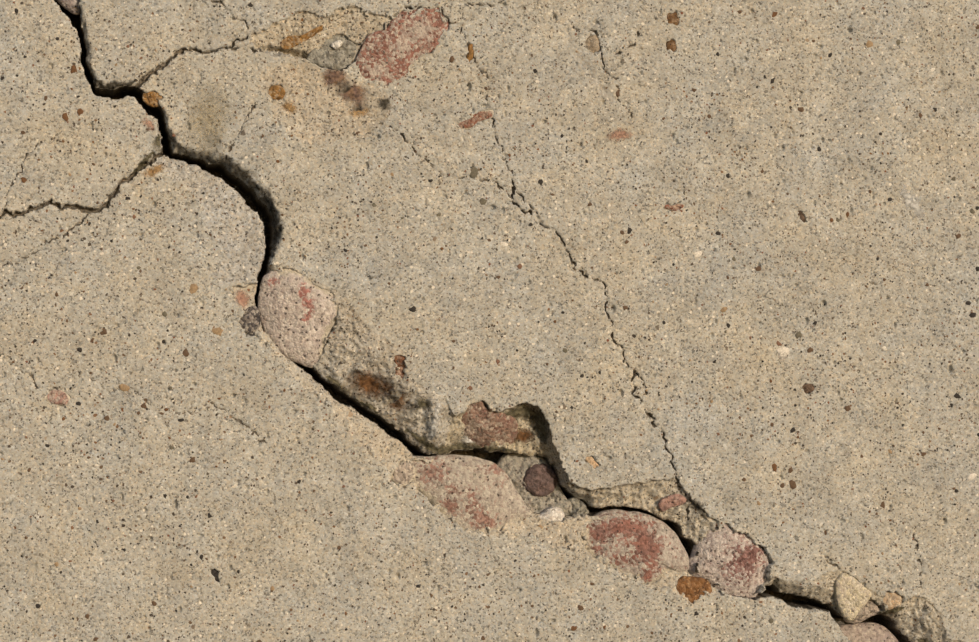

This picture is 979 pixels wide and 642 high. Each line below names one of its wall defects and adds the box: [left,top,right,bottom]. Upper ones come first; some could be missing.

crack [398,0,503,39]
spalling [250,5,397,145]
crack [573,25,640,118]
crack [0,0,273,308]
crack [78,371,267,443]
spalling [154,155,723,604]
crack [261,55,911,642]
crack [912,527,923,587]
spalling [762,570,963,642]